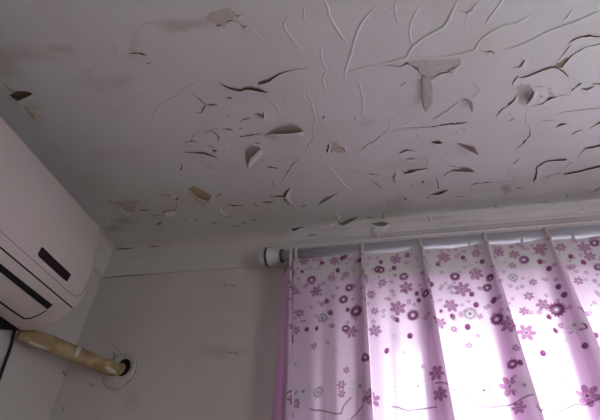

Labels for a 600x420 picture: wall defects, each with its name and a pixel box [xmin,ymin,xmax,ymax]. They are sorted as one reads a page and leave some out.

peeling [0,73,42,118]
peeling [185,94,305,169]
peeling [381,58,464,112]
crack [323,0,600,165]